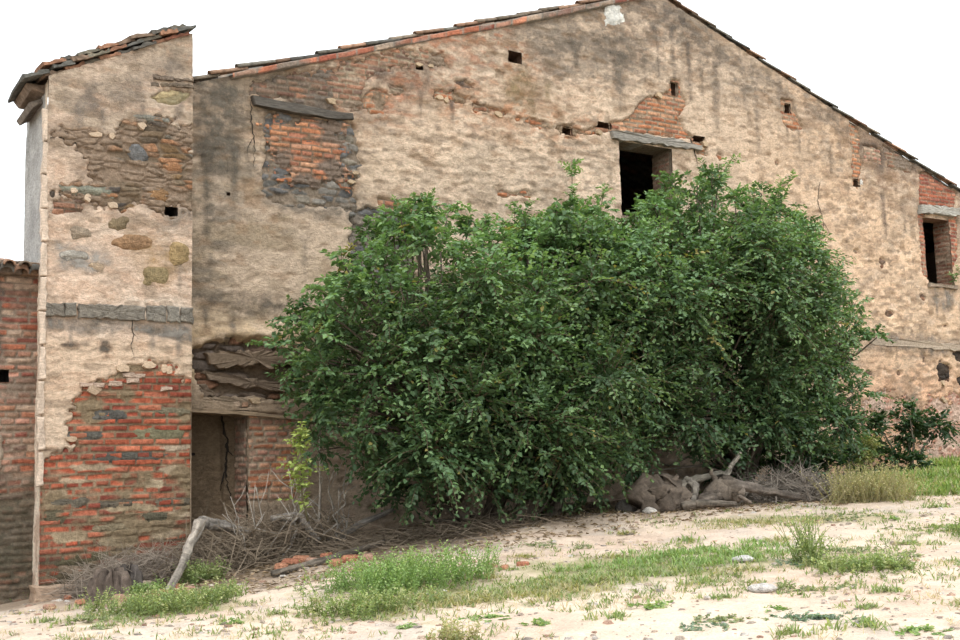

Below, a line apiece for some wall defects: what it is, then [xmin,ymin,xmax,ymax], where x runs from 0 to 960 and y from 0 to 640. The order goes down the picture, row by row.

spalling [50,90,193,221]
flaking render [249,48,445,291]
flaking render [433,80,721,161]
flaking render [849,123,958,278]
flaking render [38,359,192,610]
crack [220,416,233,500]